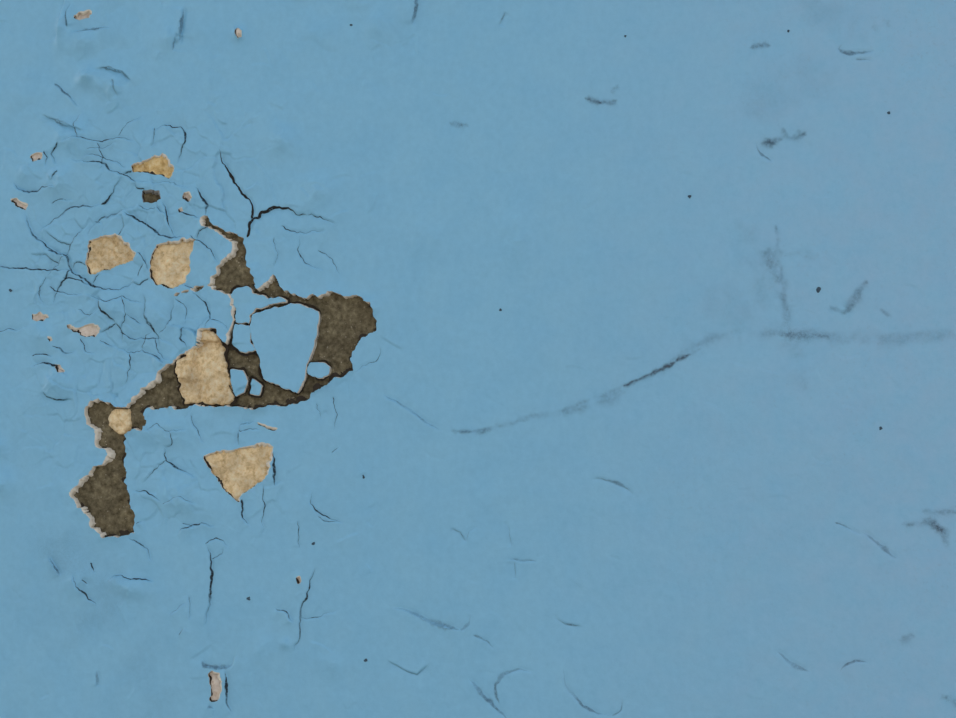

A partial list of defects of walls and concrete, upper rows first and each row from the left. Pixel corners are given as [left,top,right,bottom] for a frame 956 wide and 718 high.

crack [6,119,218,382]
peeling [131,153,174,179]
crack [220,152,337,269]
spalling [67,215,377,538]
crack [241,456,276,523]
peeling [208,671,222,702]